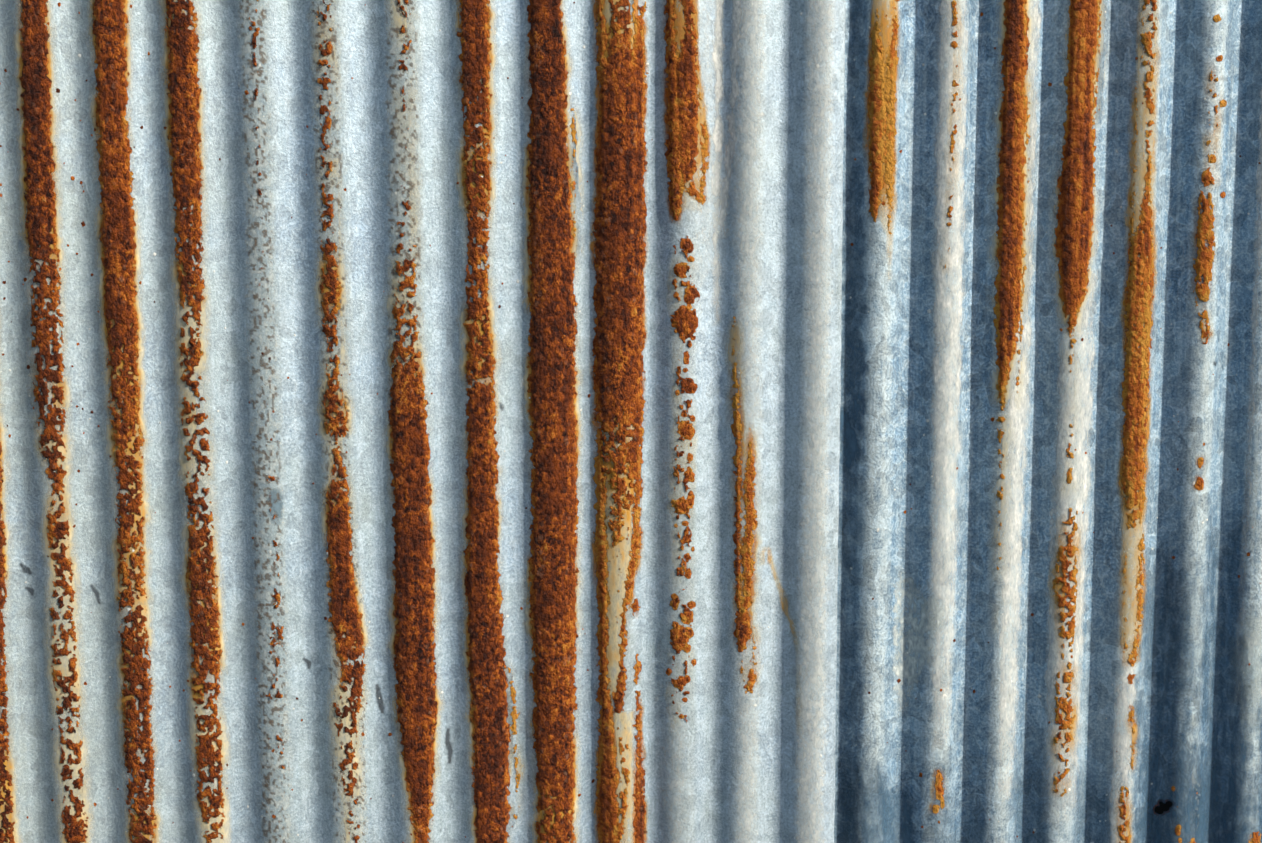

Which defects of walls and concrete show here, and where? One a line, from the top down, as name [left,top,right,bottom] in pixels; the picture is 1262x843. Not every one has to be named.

rust [0,0,174,843]
rust [148,0,229,843]
rust [239,0,303,843]
rust [306,0,372,843]
rust [377,0,441,843]
rust [456,0,710,843]
rust [728,316,796,693]
rust [854,0,902,234]
rust [991,0,1033,570]
rust [1048,508,1084,797]
rust [1048,0,1162,684]
rust [1118,786,1132,843]